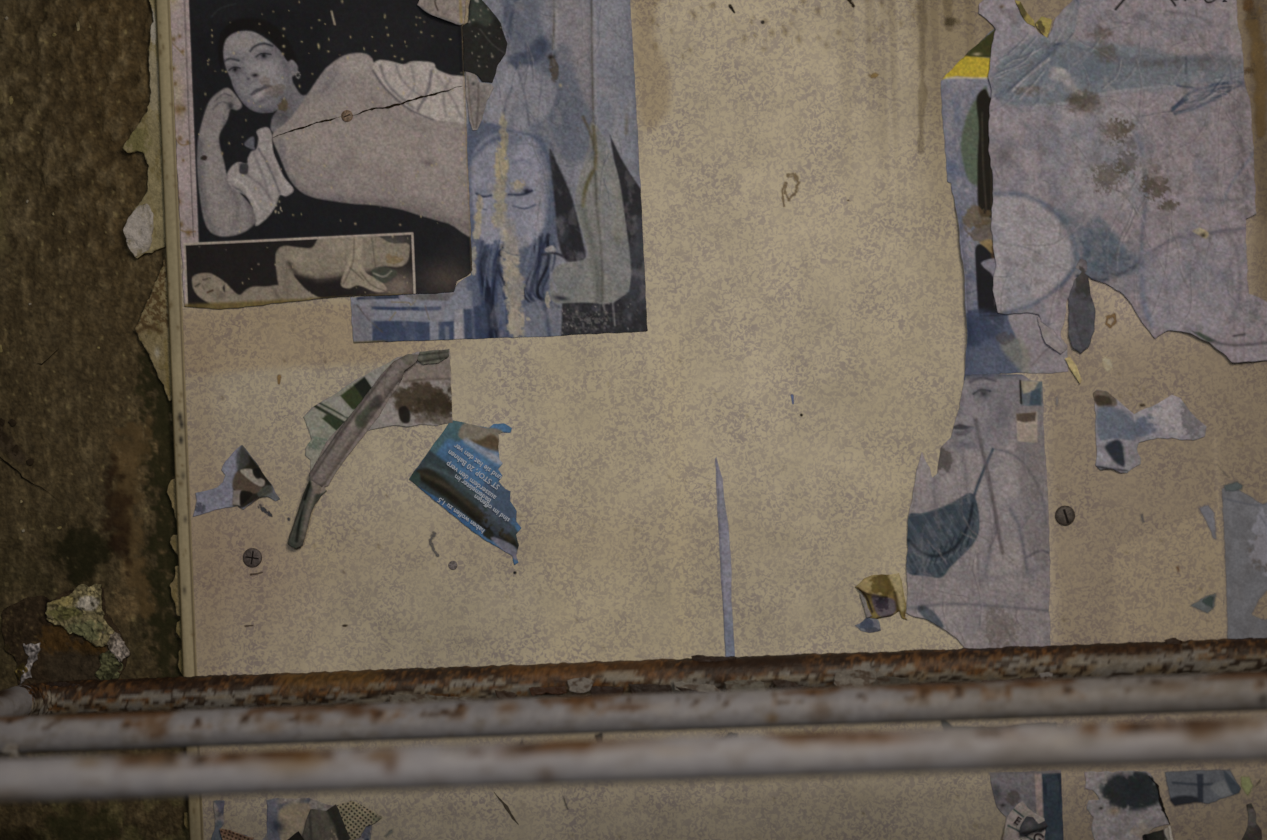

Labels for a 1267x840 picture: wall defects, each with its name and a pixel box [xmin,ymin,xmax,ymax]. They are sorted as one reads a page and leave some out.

peeling [123,0,172,401]
flaking render [1,584,131,685]